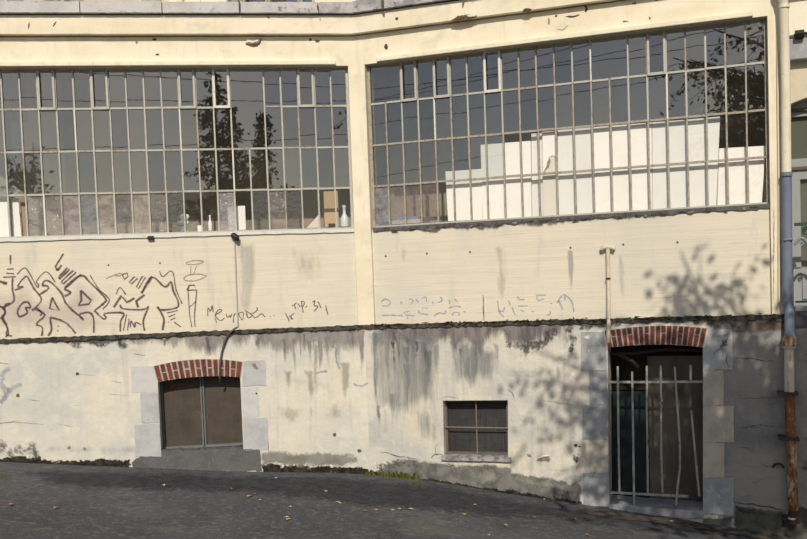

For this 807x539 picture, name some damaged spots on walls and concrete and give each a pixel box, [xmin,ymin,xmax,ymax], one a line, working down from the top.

spalling [451,14,477,22]
leakage [118,323,577,405]
leakage [0,443,39,457]